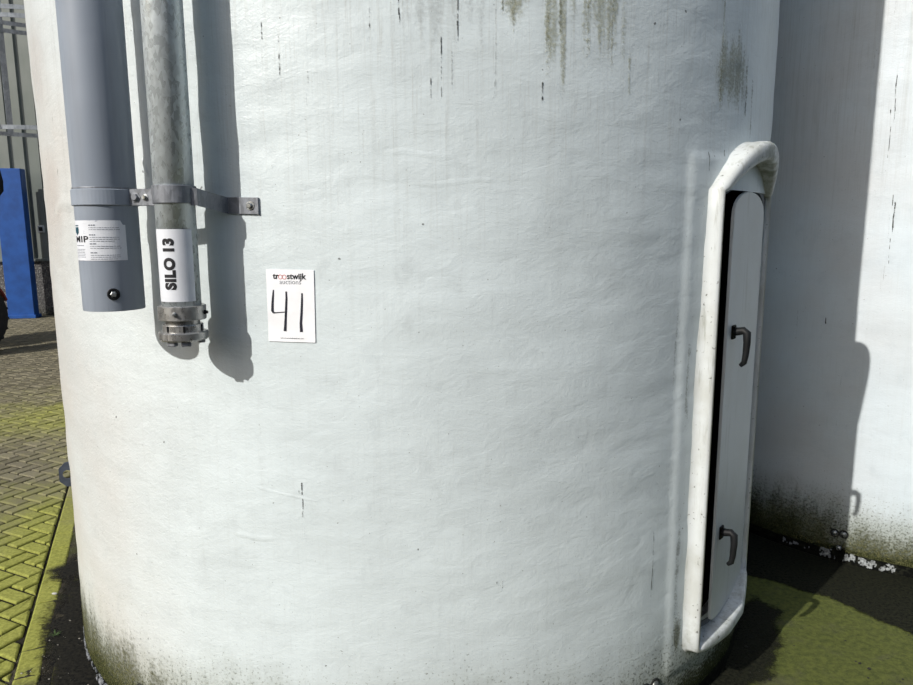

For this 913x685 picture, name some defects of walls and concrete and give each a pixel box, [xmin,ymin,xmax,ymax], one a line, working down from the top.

damp [36,556,99,685]
damp [710,598,783,685]